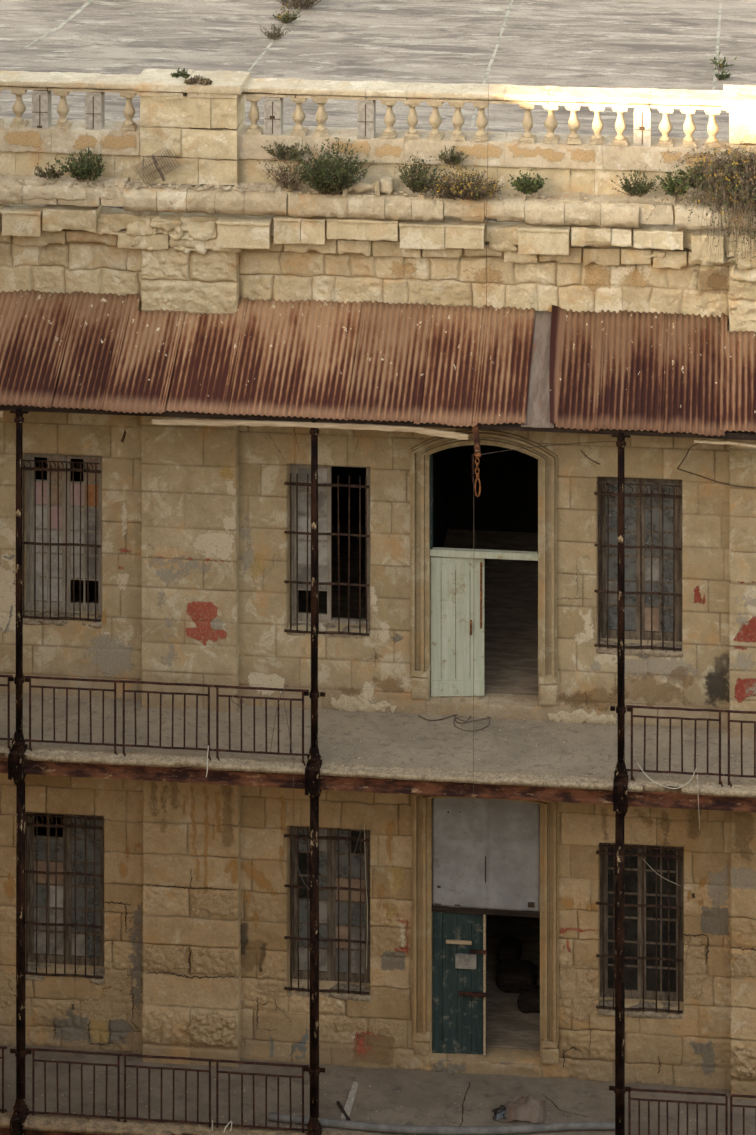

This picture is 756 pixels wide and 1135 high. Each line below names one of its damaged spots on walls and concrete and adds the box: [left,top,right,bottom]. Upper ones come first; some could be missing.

peeling [148,514,236,667]
flaking render [371,586,403,643]
peeling [730,581,756,703]
spalling [330,681,398,713]
water stain [706,654,730,706]
crack [683,934,756,964]
spalling [52,961,135,1045]